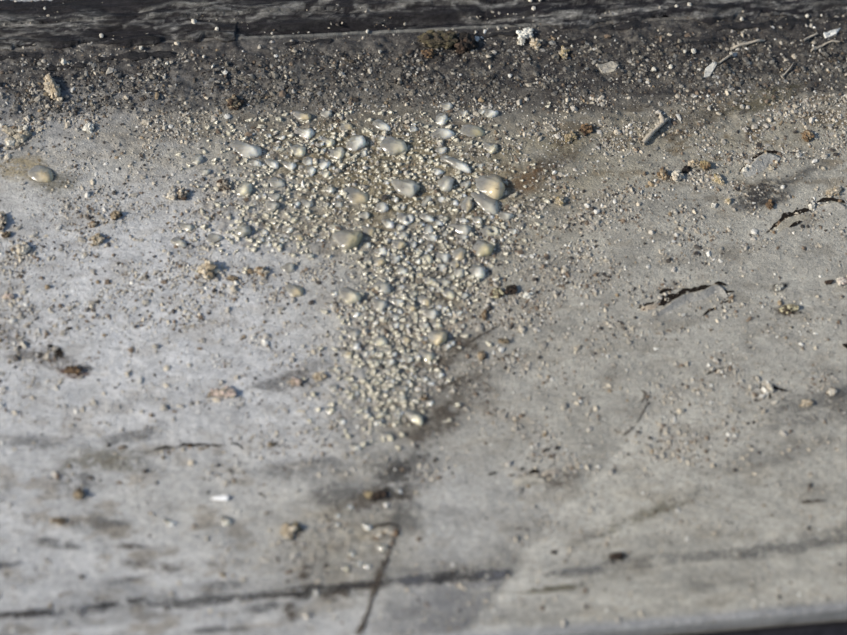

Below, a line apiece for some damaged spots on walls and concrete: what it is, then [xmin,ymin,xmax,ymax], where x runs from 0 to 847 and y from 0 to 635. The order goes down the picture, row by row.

crack [766,195,846,235]
water stain [427,338,478,368]
water stain [403,406,458,440]